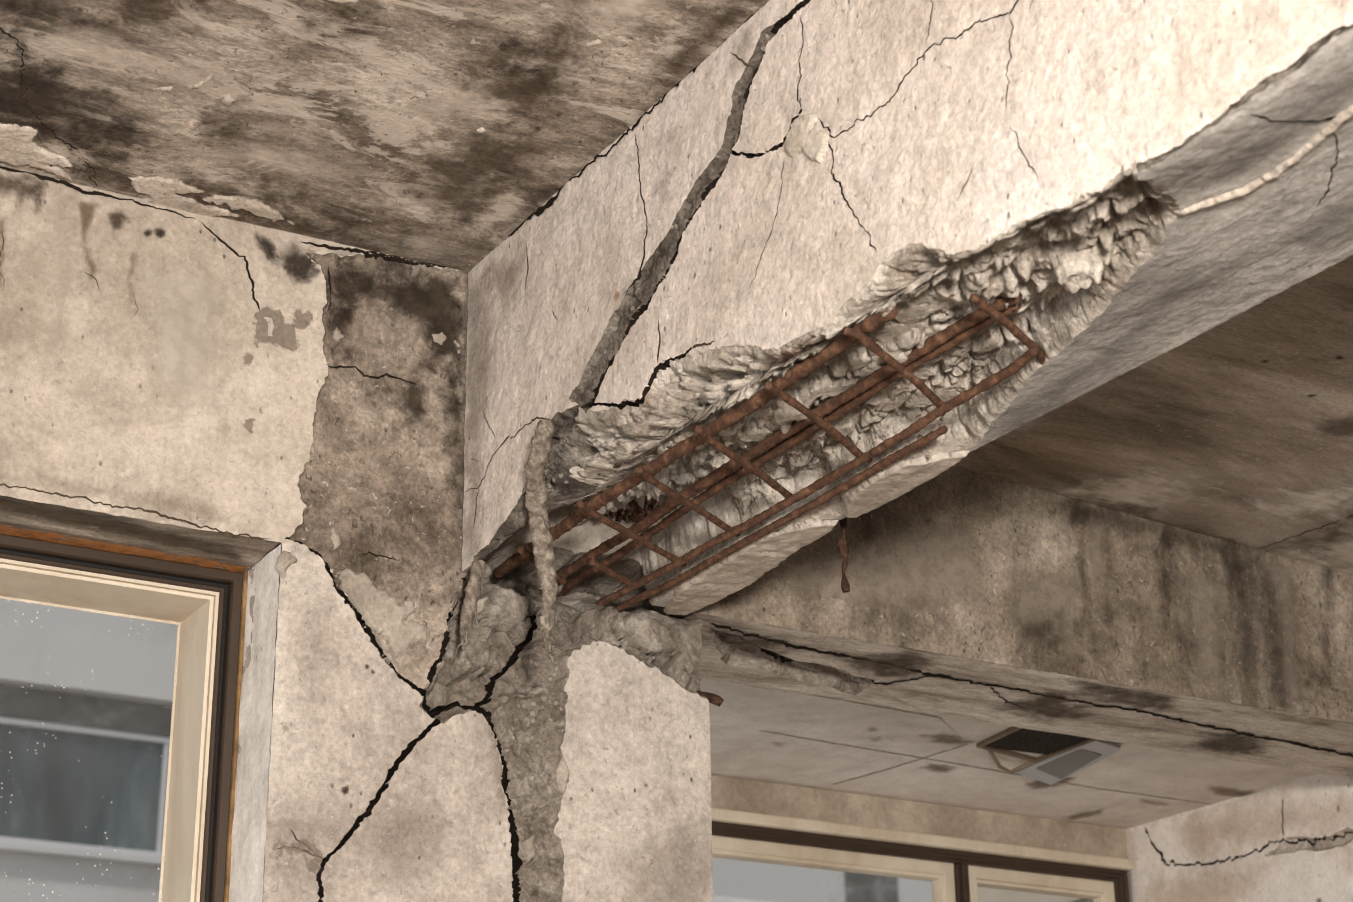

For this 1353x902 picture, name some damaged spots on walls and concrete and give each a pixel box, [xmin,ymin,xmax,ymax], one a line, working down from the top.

leakage [0,54,144,197]
flaking render [153,71,214,91]
leakage [470,24,568,118]
leakage [176,178,464,475]
corrosion [778,346,808,364]
crack [0,0,1038,902]
spalling [244,24,1353,902]
corrosion [606,496,659,531]
leakage [787,532,977,607]
crack [710,623,1353,785]
crack [1060,782,1212,805]
crack [1145,800,1353,867]